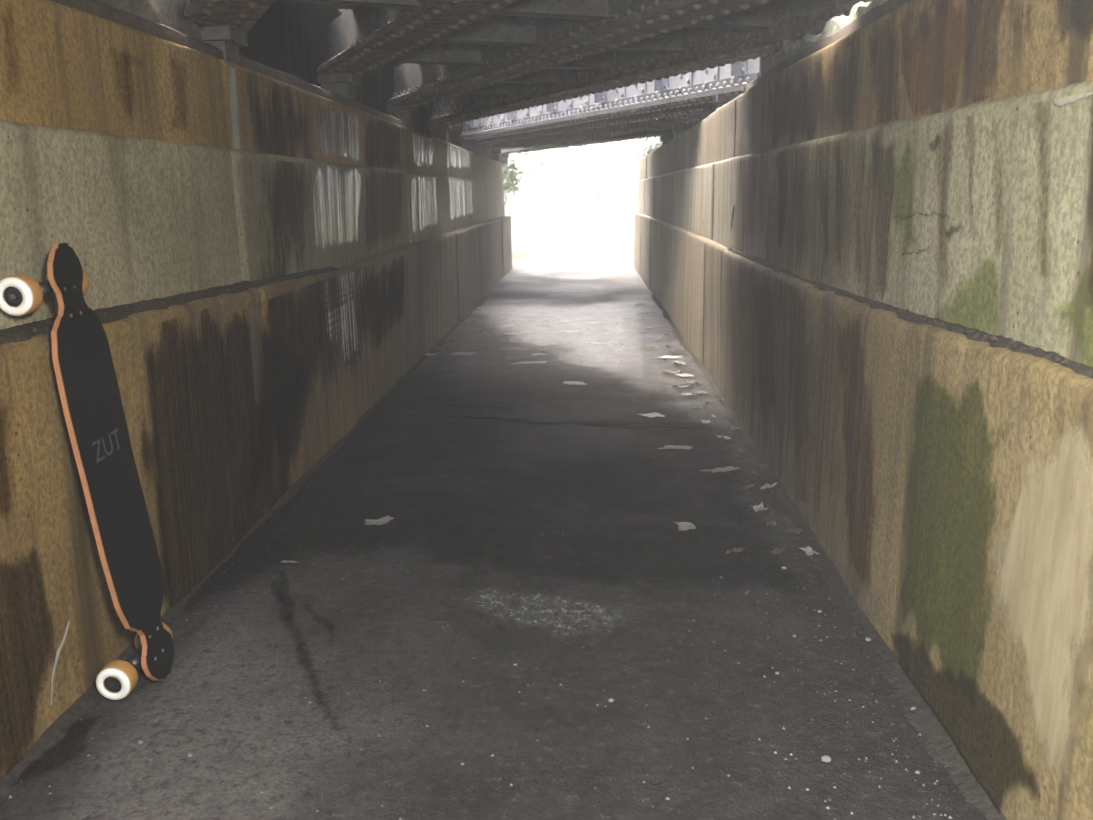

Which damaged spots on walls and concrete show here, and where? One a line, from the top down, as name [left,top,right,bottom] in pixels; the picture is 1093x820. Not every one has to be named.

damp [255,88,361,276]
damp [144,269,403,608]
crack [372,404,698,430]
damp [0,554,70,770]